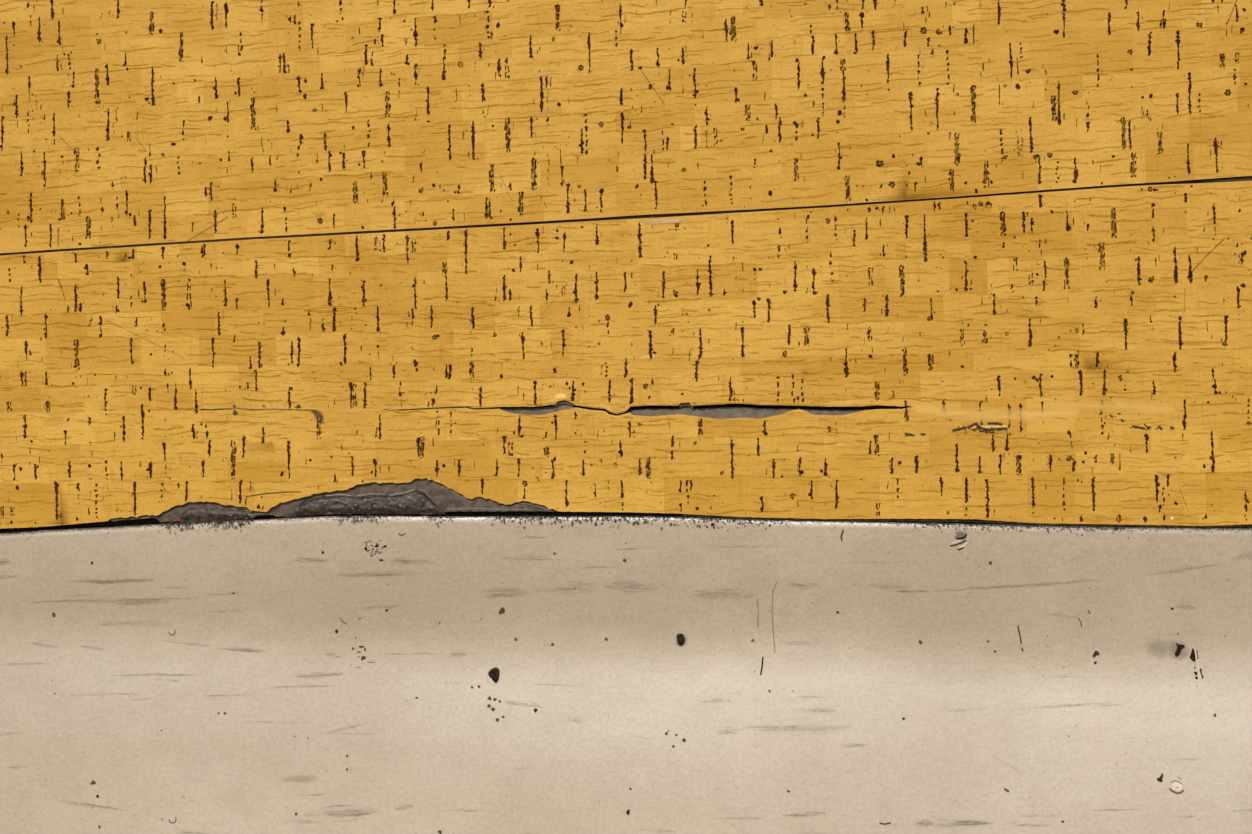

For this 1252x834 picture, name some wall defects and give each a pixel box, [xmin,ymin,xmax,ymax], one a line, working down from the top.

crack [383,393,1079,421]
spalling [110,478,556,523]